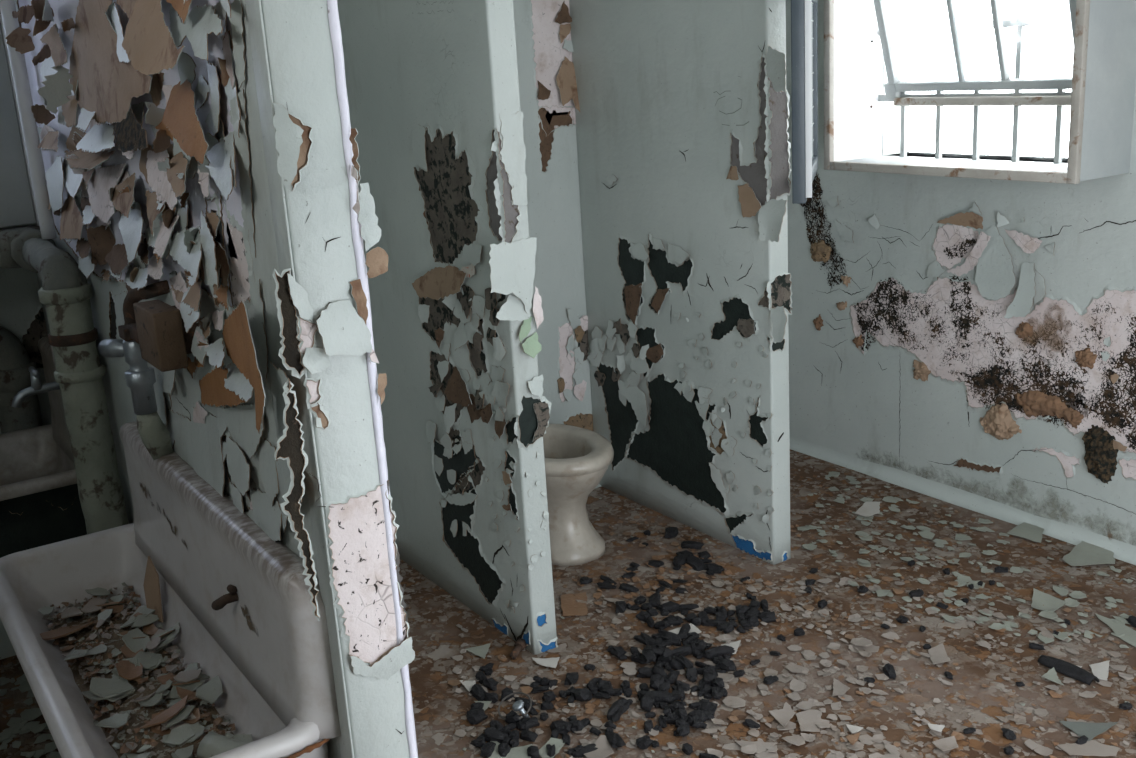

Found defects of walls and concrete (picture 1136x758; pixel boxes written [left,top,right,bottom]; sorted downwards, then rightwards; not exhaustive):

peeling [0,0,415,680]
peeling [412,0,580,668]
peeling [459,680,492,711]